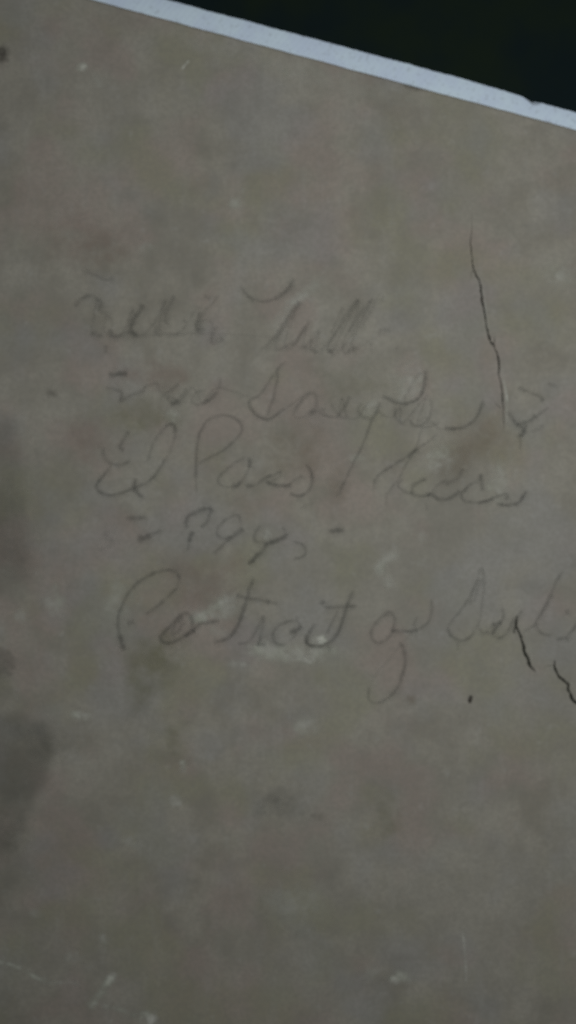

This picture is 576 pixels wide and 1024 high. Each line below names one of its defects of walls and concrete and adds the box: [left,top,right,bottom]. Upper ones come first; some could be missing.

crack [470,244,508,403]
crack [515,618,576,703]